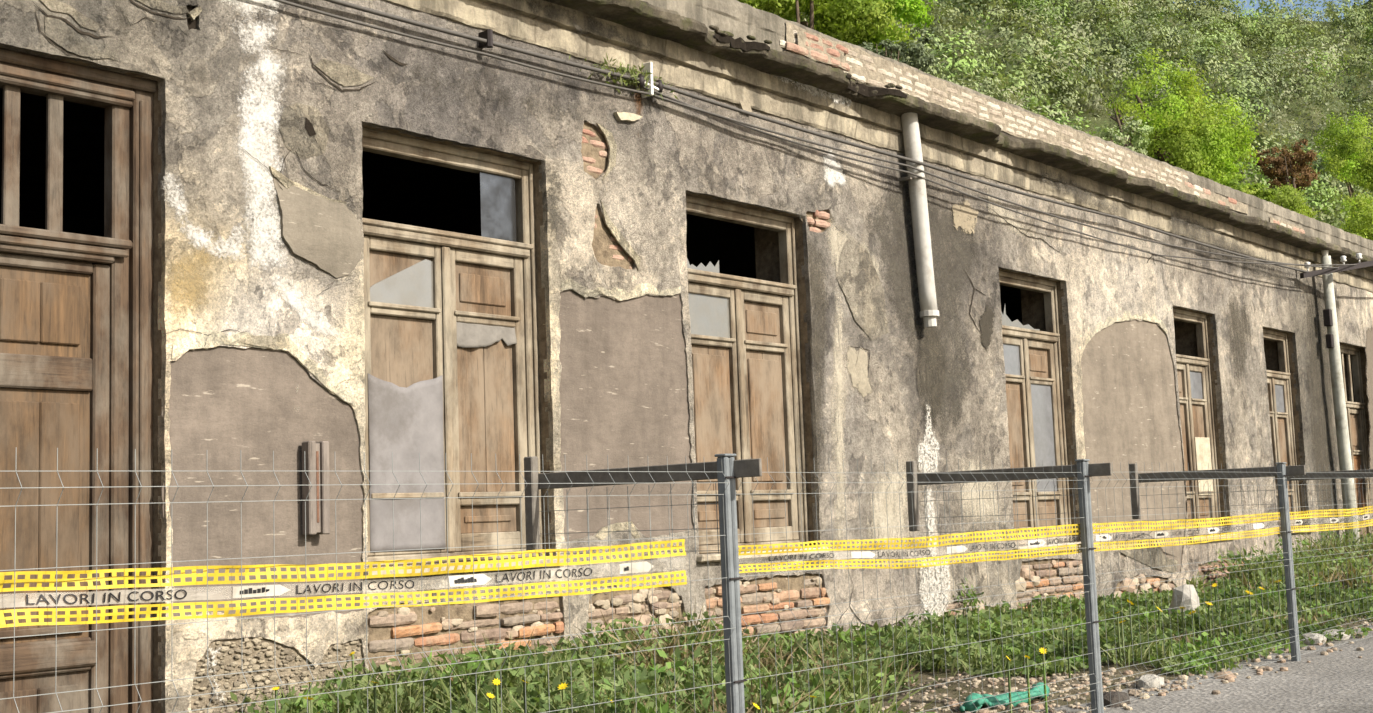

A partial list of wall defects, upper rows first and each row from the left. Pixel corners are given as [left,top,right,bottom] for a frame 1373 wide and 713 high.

crack [32,0,190,58]
spalling [581,112,642,181]
damp [823,150,846,187]
spalling [709,22,1248,214]
spalling [801,210,832,233]
flaking render [952,200,979,234]
flaking render [559,200,693,542]
damp [809,183,977,619]
flaking render [1081,311,1187,600]
flaking render [162,330,565,713]
spalling [1198,558,1244,593]